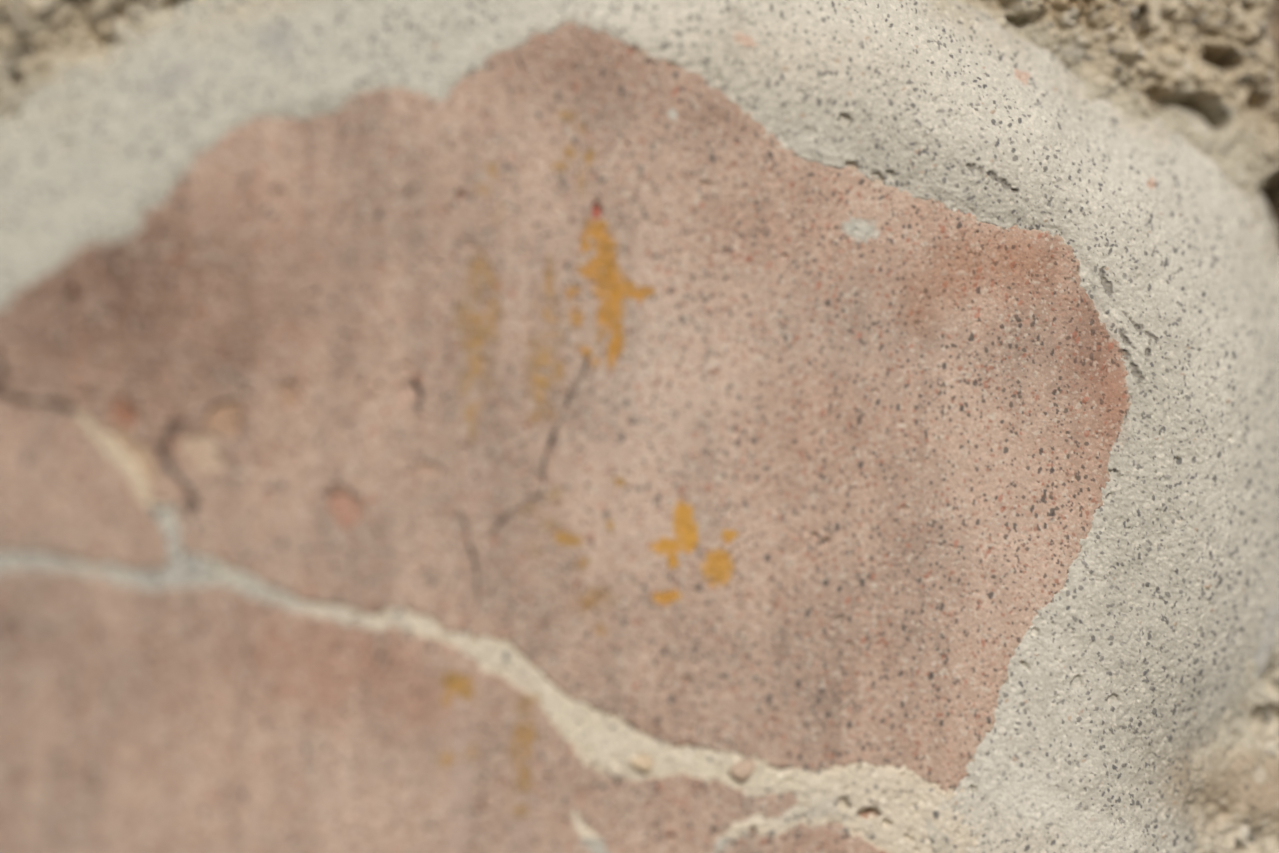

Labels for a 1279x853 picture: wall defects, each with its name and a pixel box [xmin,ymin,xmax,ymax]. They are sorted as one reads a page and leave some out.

spalling [0,0,206,121]
spalling [951,0,1279,253]
crack [0,345,987,853]
spalling [1213,644,1279,754]
spalling [1194,818,1279,853]